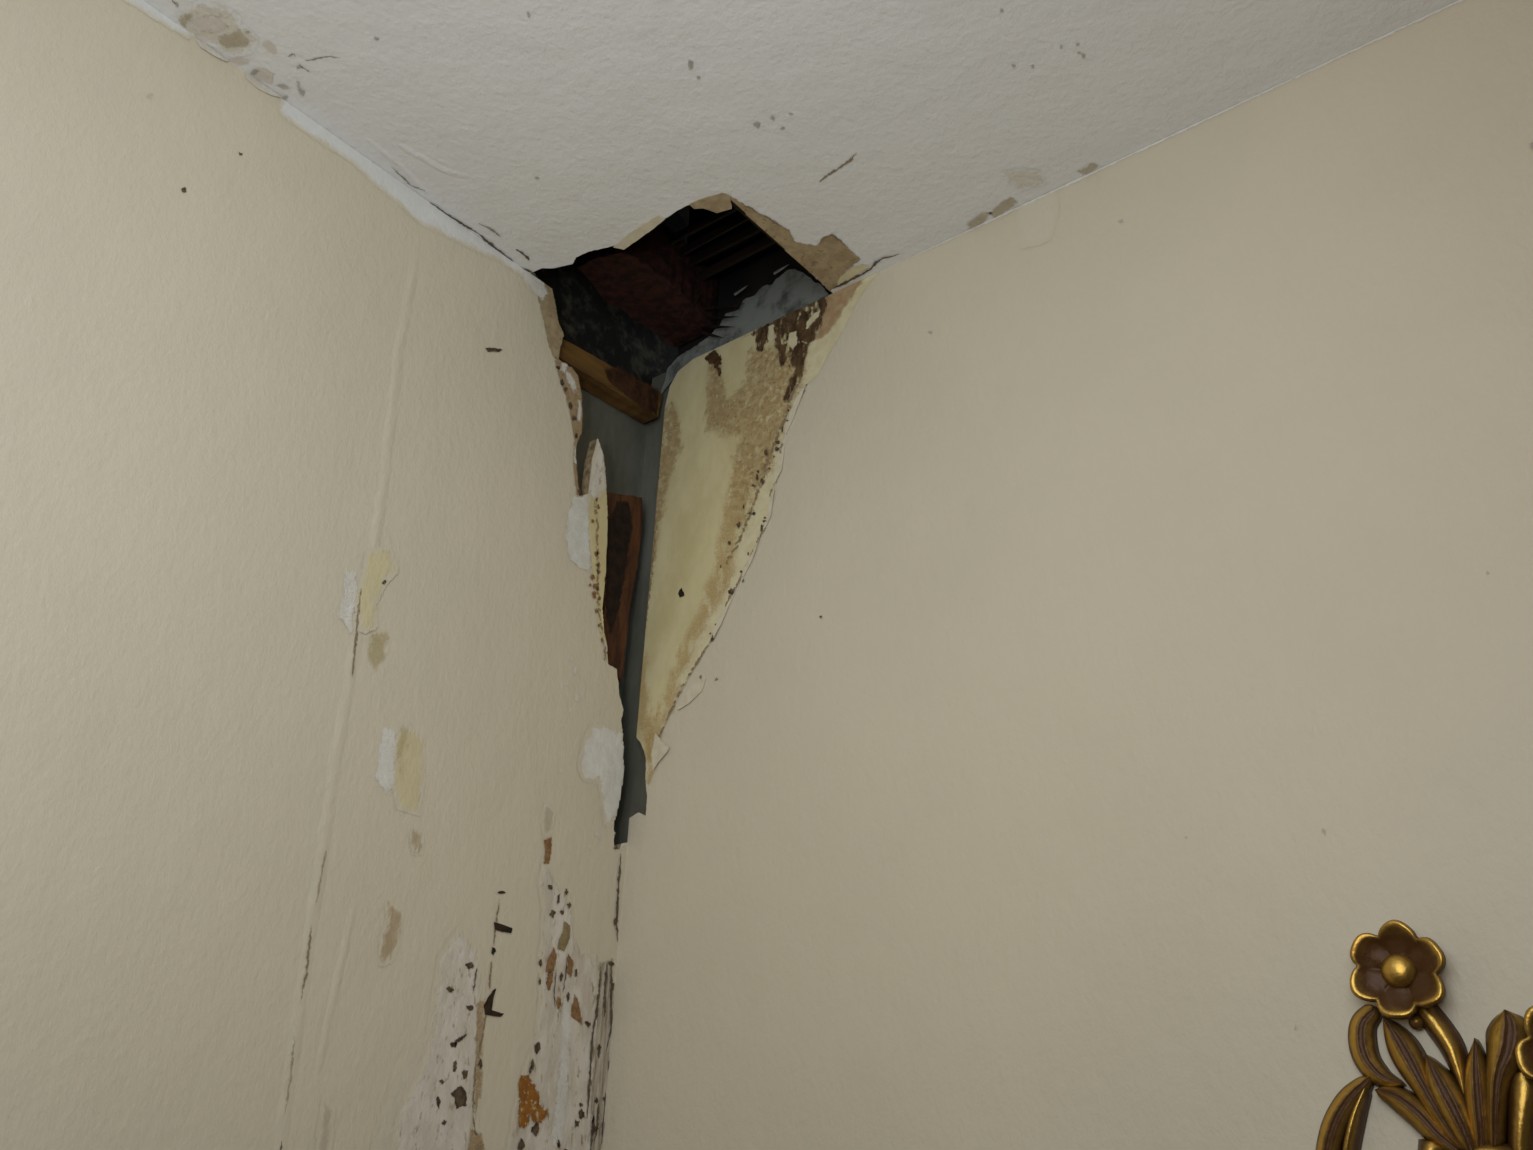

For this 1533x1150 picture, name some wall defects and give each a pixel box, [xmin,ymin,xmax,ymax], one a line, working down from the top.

peeling [174,0,337,99]
damp [650,400,684,578]
damp [703,279,864,530]
peeling [774,386,805,483]
crack [352,591,362,677]
damp [636,650,660,760]
peeling [559,721,624,850]
crack [301,851,327,998]
crack [280,1041,295,1150]
peeling [370,926,486,1150]
peeling [504,837,603,1150]